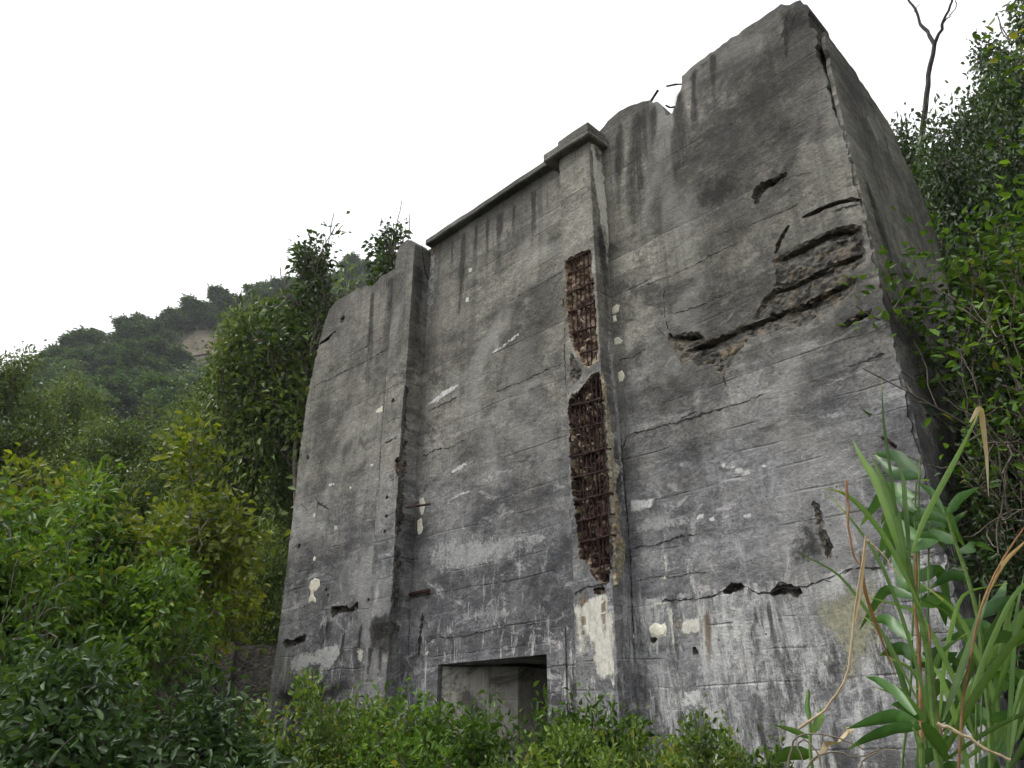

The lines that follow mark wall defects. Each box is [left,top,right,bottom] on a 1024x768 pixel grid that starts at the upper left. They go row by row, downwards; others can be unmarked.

water stain [672,57,716,157]
water stain [697,172,735,207]
water stain [451,207,515,308]
crack [641,197,862,287]
spalling [659,224,866,385]
spalling [843,308,873,328]
spalling [562,248,626,588]
crack [574,394,881,683]
spalling [324,587,370,619]